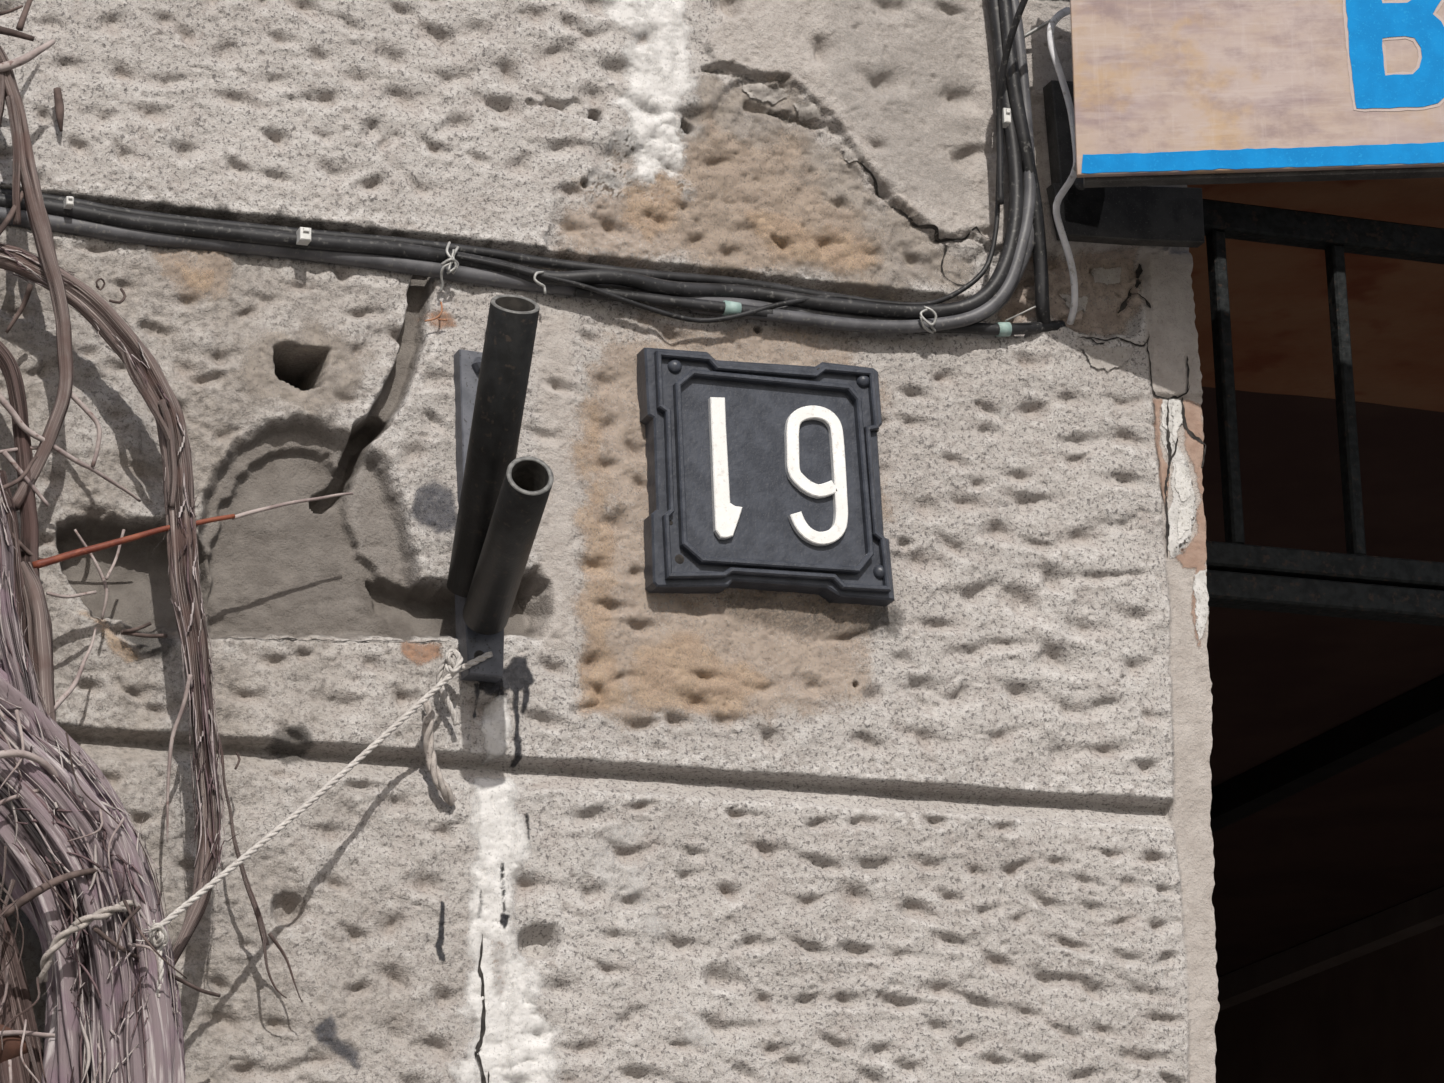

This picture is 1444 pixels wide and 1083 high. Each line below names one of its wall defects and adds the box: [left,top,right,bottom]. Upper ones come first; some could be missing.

water stain [582,0,698,205]
spalling [609,71,971,301]
crack [860,162,991,286]
spalling [238,323,360,411]
crack [1080,264,1206,558]
peeling [1153,397,1209,646]
water stain [450,681,562,1083]
crack [475,934,490,1083]